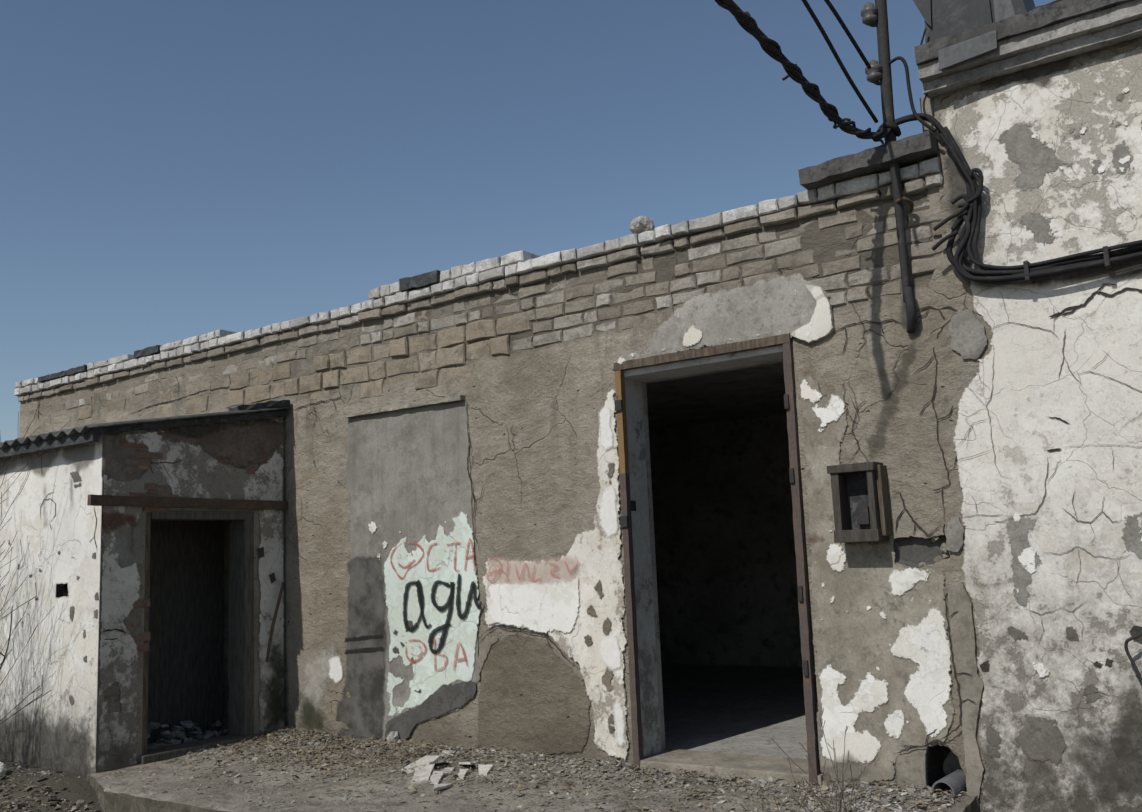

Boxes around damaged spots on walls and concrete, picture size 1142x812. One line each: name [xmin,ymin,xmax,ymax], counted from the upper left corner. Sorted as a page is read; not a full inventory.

peeling [998,122,1086,191]
peeling [1091,140,1134,174]
peeling [1020,212,1063,245]
peeling [616,273,835,364]
crack [466,410,484,549]
crack [835,283,1142,643]
spalling [102,418,352,749]
peeling [368,390,629,795]
peeling [772,373,955,812]
crack [894,589,976,754]
water stain [0,713,89,777]
water stain [1092,705,1142,797]